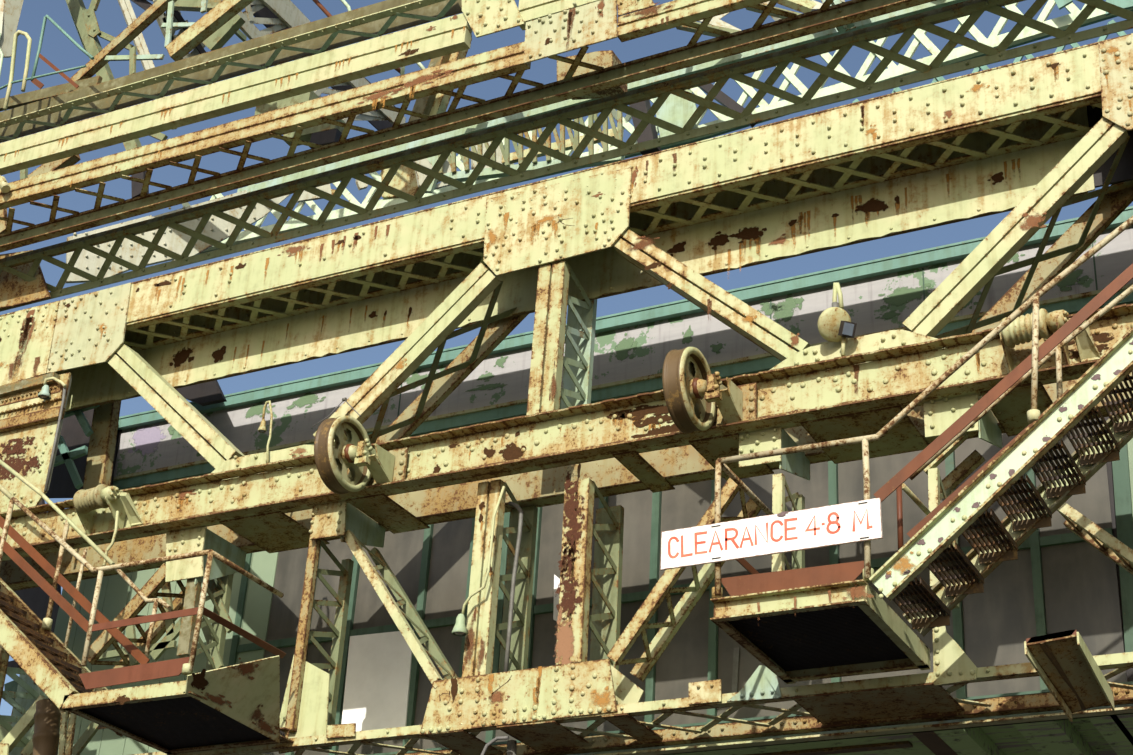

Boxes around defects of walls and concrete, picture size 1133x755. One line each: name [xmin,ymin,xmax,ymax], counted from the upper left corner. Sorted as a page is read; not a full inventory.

corrosion [832,187,907,236]
corrosion [708,211,810,270]
peeling [757,294,804,323]
peeling [875,283,932,319]
corrosion [0,309,40,379]
peeling [615,333,638,361]
peeling [682,326,693,344]
corrosion [607,404,680,438]
corrosion [0,436,42,480]
peeling [128,422,181,457]
corrosion [448,430,526,461]
corrosion [555,464,585,622]